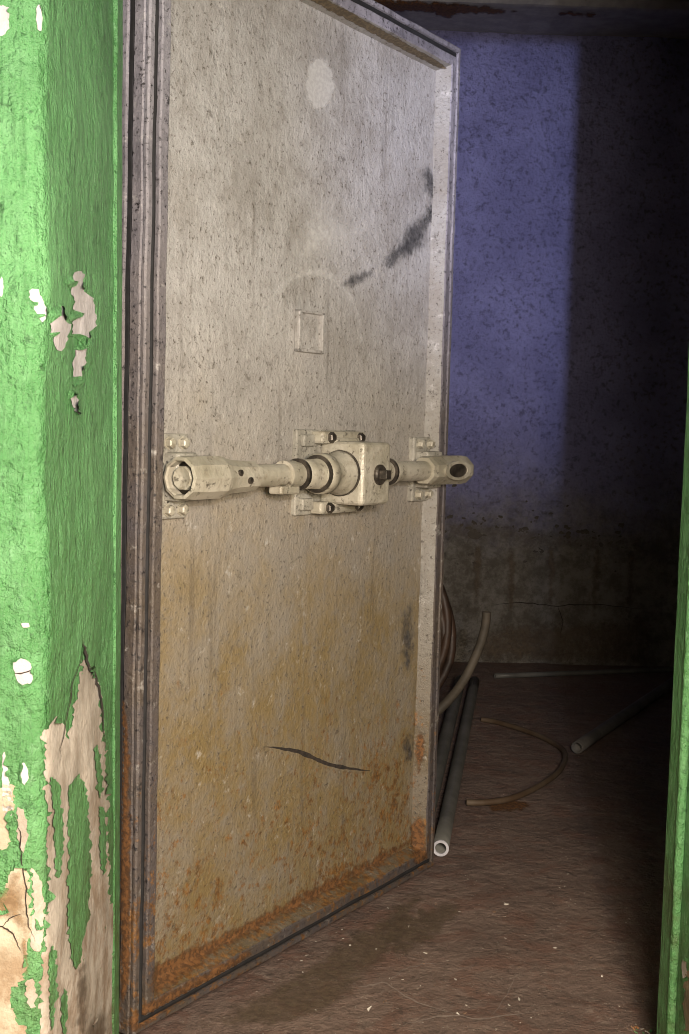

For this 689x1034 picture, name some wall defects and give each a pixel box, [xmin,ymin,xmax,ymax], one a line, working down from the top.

peeling [0,5,13,36]
peeling [29,271,97,415]
crack [0,810,35,950]
peeling [0,657,114,1034]
peeling [680,957,689,1031]